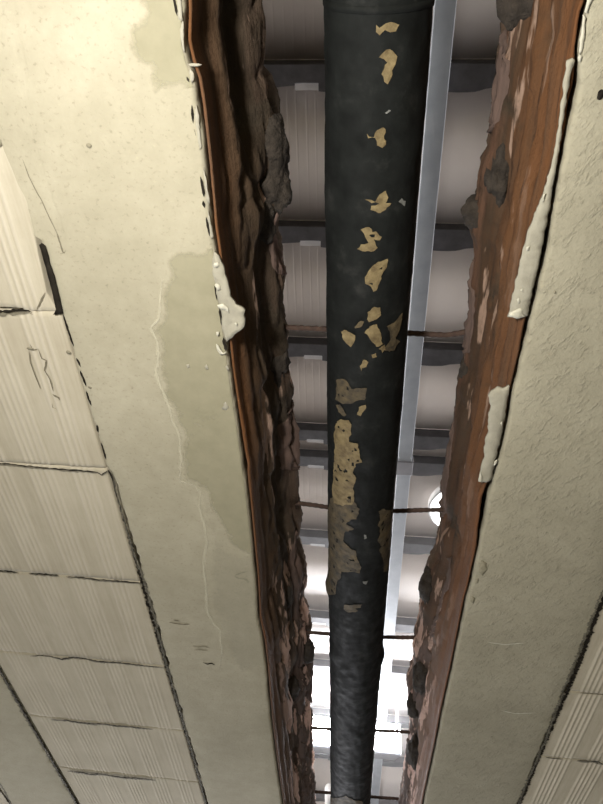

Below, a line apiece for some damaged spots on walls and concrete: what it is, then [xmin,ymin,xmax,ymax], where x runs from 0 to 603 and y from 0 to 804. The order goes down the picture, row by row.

leakage [134,0,193,88]
leakage [150,248,251,667]
peeling [212,250,246,355]
peeling [507,0,592,319]